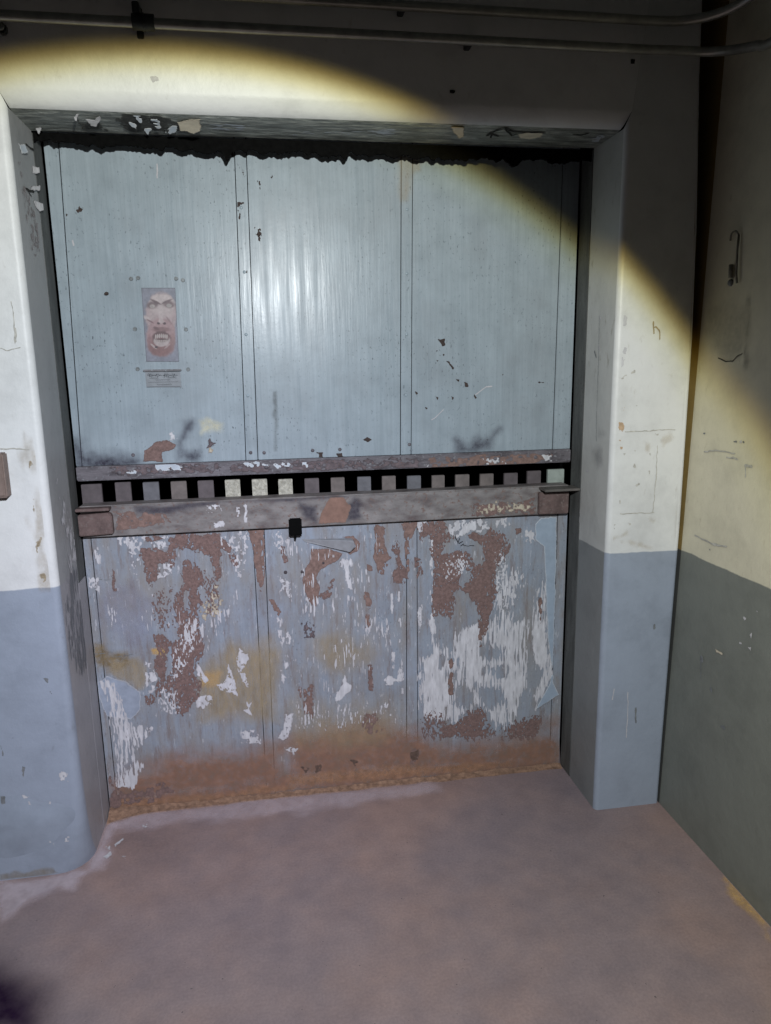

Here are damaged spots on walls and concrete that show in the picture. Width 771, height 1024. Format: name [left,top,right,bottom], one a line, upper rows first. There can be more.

spalling [74,114,253,134]
rust [109,440,553,476]
peeling [98,584,253,790]
rust [116,503,238,716]
peeling [207,504,249,578]
rust [277,497,359,524]
rust [302,536,360,606]
peeling [273,531,404,755]
rust [367,497,536,647]
peeling [416,517,559,730]
peeling [448,501,531,538]
rust [108,707,559,808]